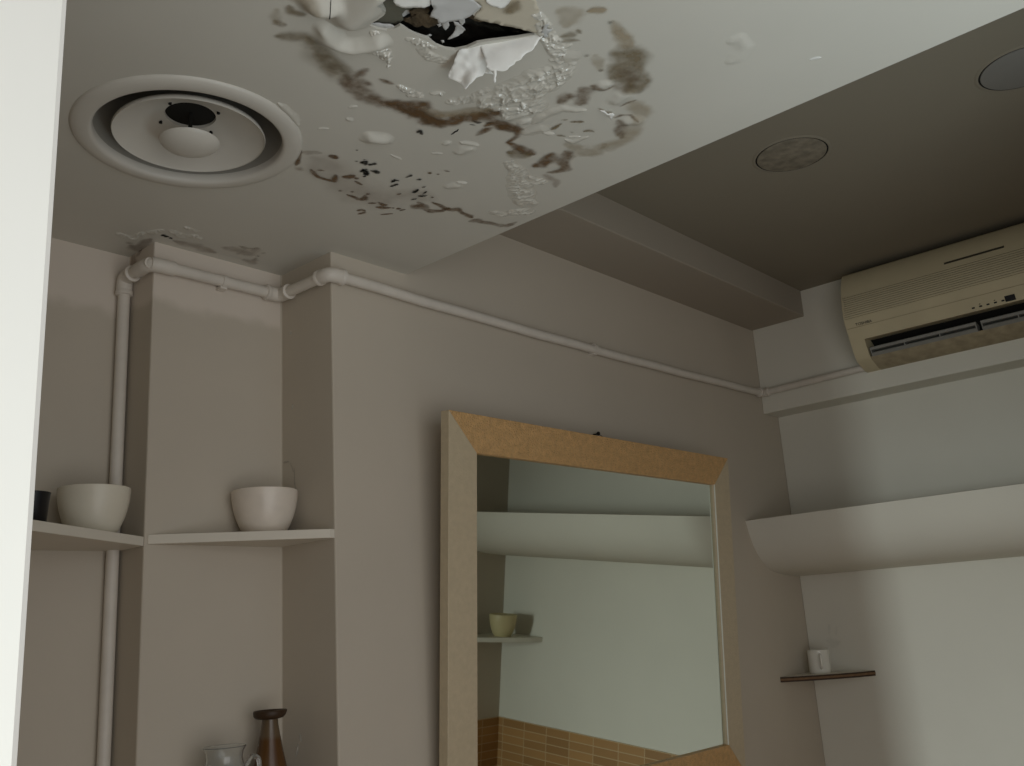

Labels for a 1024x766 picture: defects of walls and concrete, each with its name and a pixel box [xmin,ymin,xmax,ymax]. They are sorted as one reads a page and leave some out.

peeling [393,0,553,89]
water stain [588,8,649,93]
water stain [342,71,572,173]
water stain [311,150,490,223]